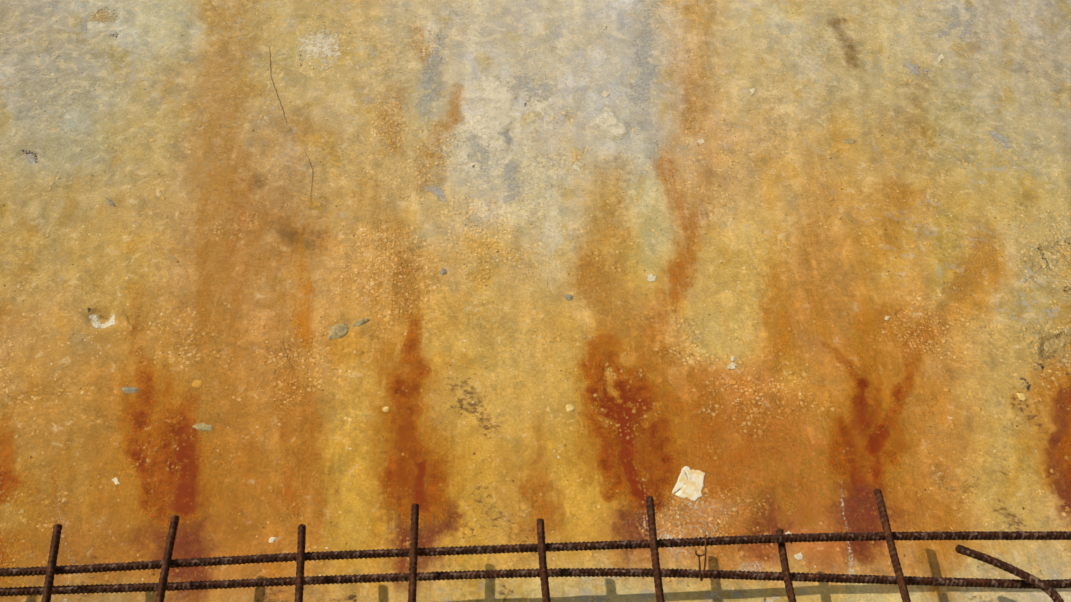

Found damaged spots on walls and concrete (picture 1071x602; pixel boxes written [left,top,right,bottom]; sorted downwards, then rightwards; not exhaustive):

corrosion [118,362,218,600]
corrosion [373,321,459,583]
corrosion [577,209,821,560]
corrosion [825,333,945,571]
corrosion [1038,366,1071,513]